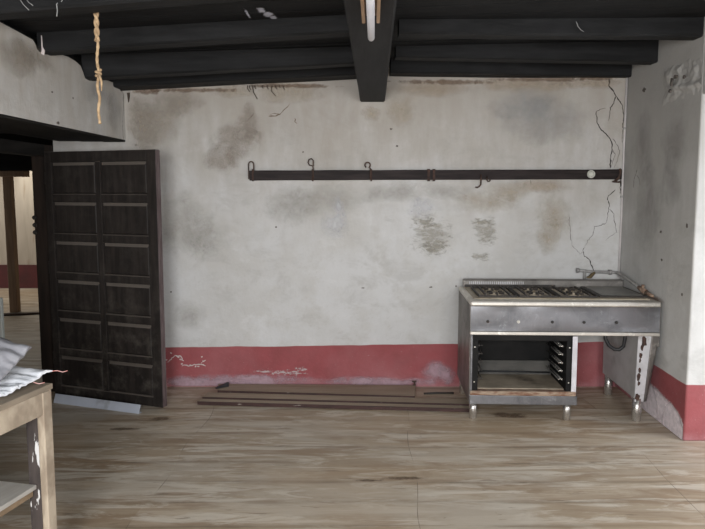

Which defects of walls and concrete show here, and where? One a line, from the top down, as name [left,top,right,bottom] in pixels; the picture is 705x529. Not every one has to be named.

crack [569,80,640,270]
leakage [427,364,450,383]